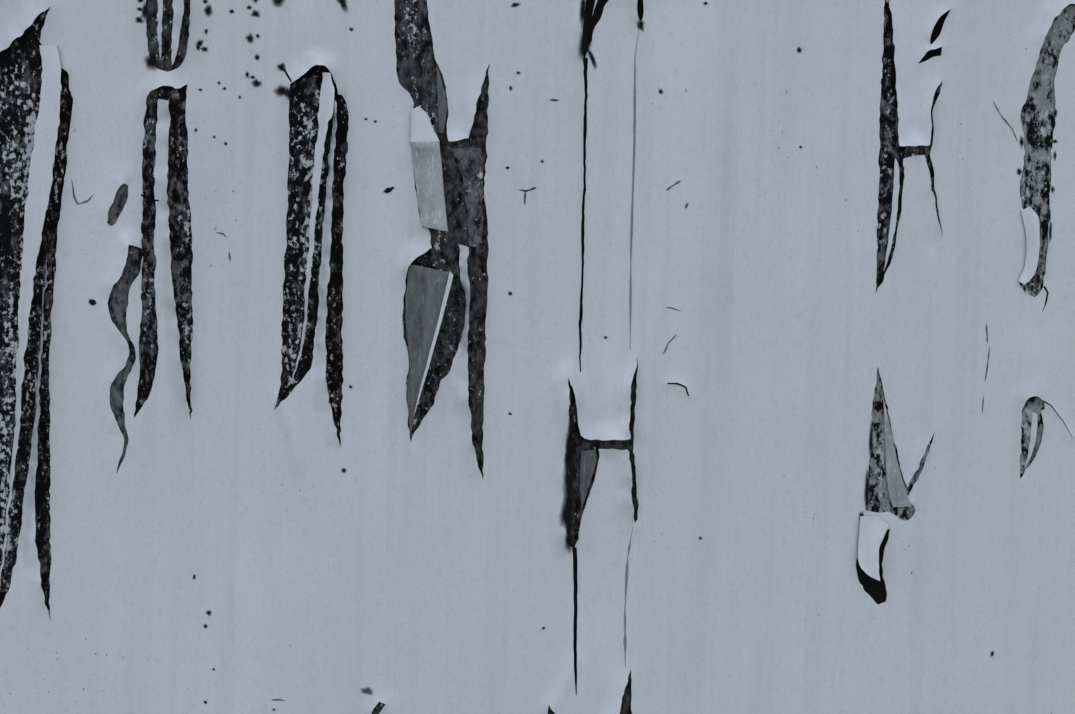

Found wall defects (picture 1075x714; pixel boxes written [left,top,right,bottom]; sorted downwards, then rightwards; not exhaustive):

peeling [0,7,73,621]
peeling [89,85,193,474]
peeling [146,0,190,72]
peeling [274,65,349,447]
peeling [394,0,489,478]
crack [571,542,579,695]
crack [579,55,588,372]
peeling [567,361,639,545]
peeling [856,368,935,605]
peeling [876,0,942,291]
peeling [918,9,951,64]
peeling [1018,4,1075,297]